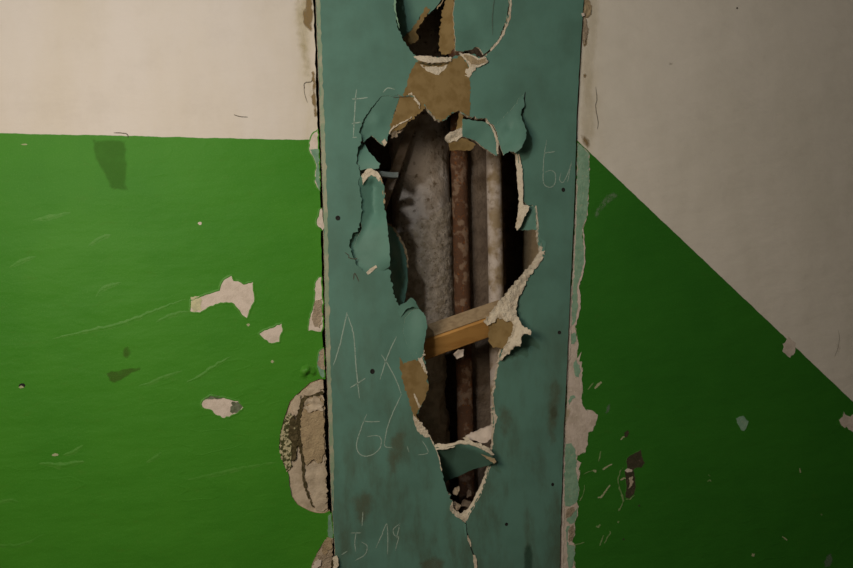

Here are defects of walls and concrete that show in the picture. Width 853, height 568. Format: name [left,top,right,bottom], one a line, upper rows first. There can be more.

spalling [445,94,547,361]
peeling [188,274,256,326]
peeling [257,322,285,345]
spalling [349,93,498,523]
peeling [560,143,598,568]
peeling [783,337,796,358]
peeling [200,394,245,420]
peeling [838,411,853,433]
flaking render [279,347,339,568]
peeling [617,449,645,511]